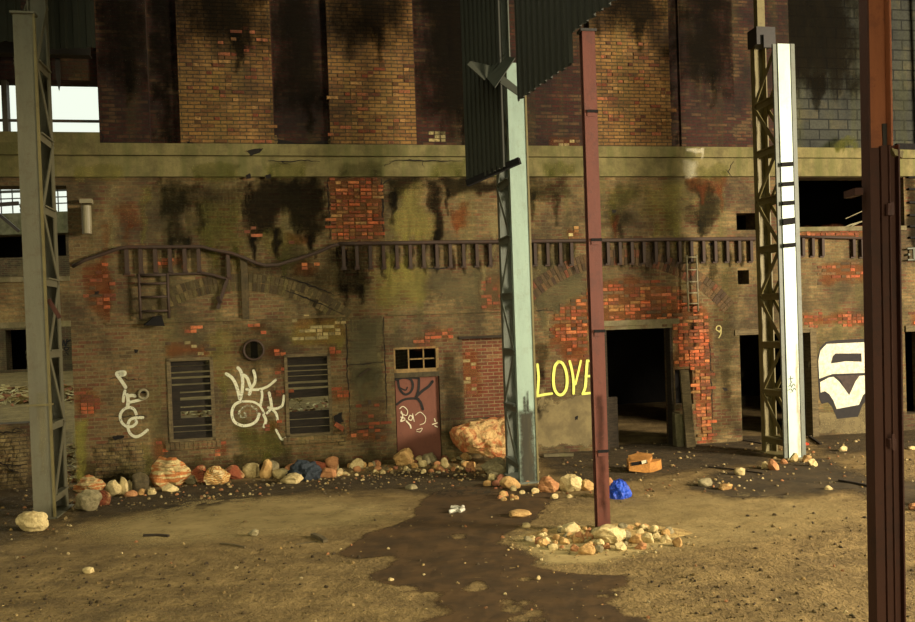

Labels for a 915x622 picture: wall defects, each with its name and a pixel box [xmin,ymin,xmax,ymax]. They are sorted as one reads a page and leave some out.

spalling [325,177,385,240]
damp [271,228,283,257]
flaking render [532,258,589,382]
spalling [463,352,477,394]
spalling [603,280,728,444]
flaking render [537,388,592,448]